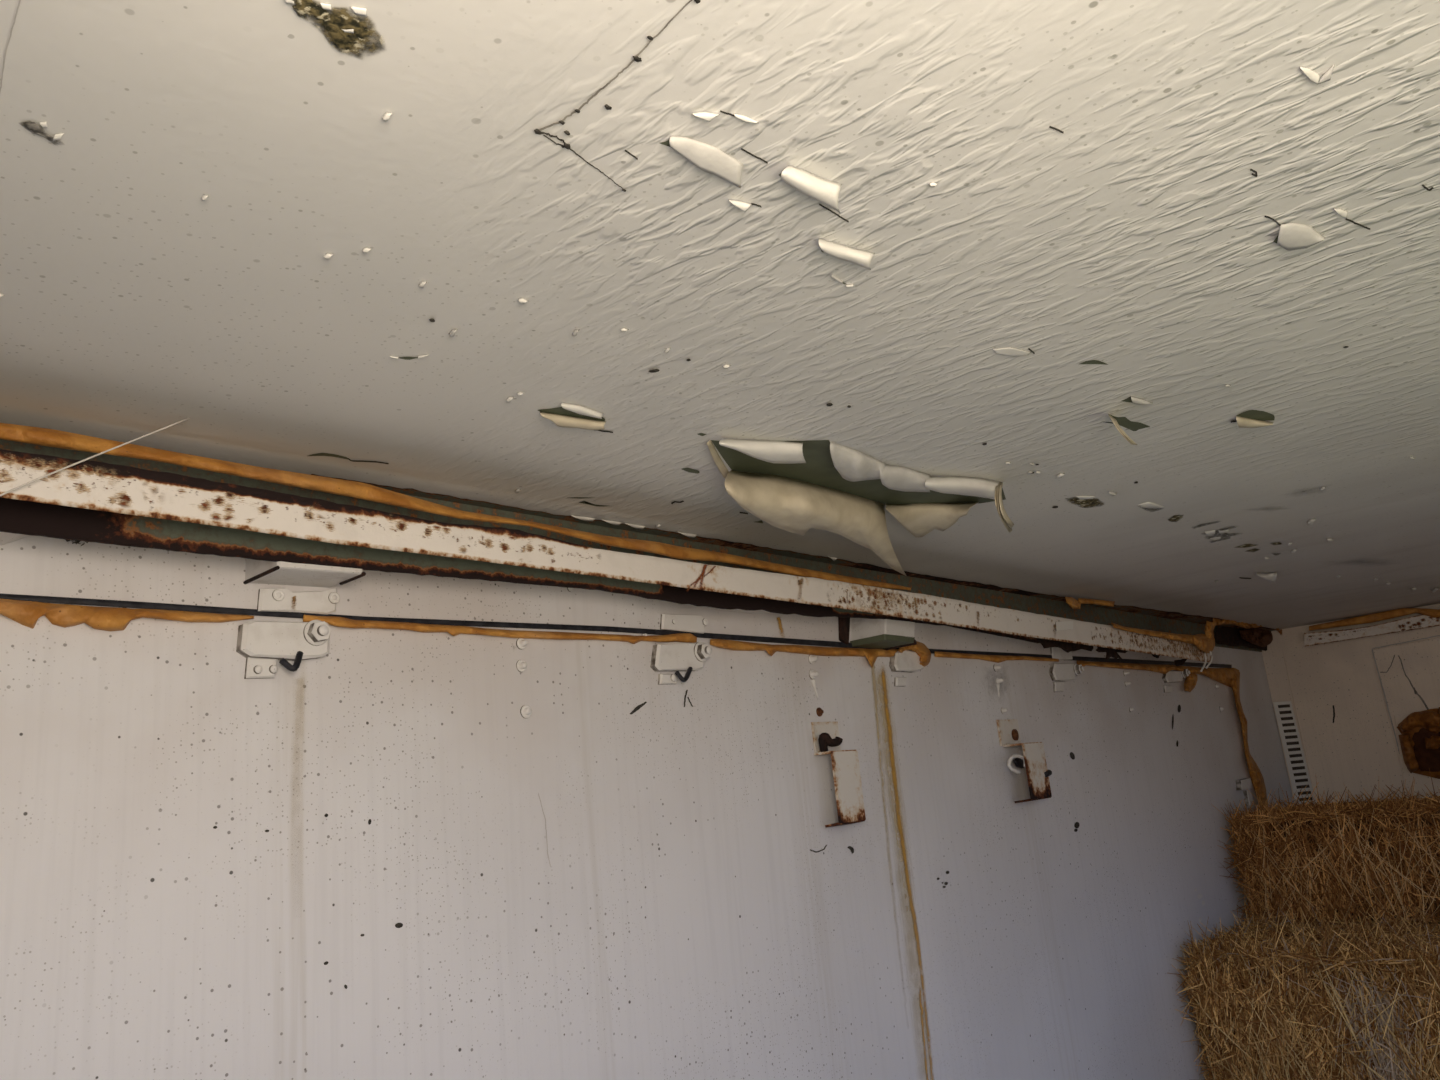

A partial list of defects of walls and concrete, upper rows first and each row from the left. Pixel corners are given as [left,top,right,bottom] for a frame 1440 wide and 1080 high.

crack [534,0,701,192]
peeling [660,136,762,212]
crack [741,148,768,164]
peeling [779,165,849,223]
peeling [818,238,875,288]
peeling [538,402,613,433]
corrosion [0,455,135,507]
corrosion [176,489,597,564]
peeling [309,433,1297,631]
corrosion [243,566,280,584]
corrosion [831,586,1024,621]
corrosion [1214,626,1273,651]